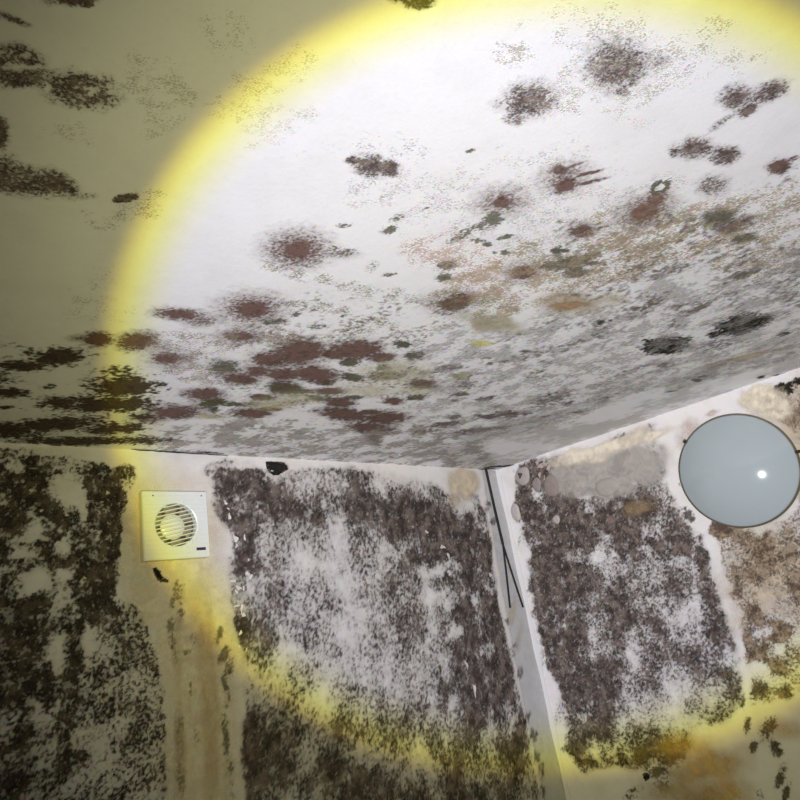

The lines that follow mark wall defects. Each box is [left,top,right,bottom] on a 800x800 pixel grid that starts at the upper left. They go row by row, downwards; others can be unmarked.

leakage [0,43,119,111]
leakage [500,15,709,125]
leakage [714,80,789,129]
leakage [0,117,94,197]
leakage [346,154,399,177]
leakage [548,162,607,194]
leakage [670,138,740,165]
leakage [701,177,726,194]
leakage [767,155,798,190]
spalling [265,461,289,475]
leakage [0,180,800,800]